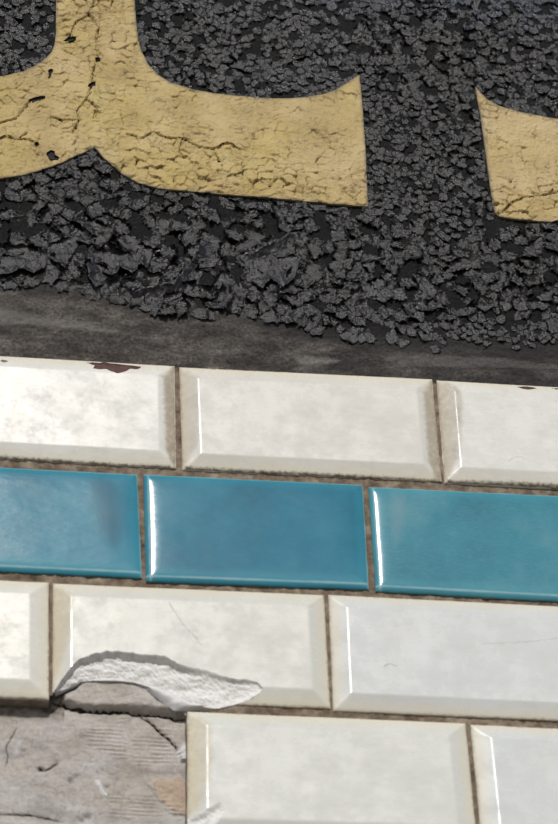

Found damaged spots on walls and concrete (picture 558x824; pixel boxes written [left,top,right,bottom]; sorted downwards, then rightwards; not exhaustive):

peeling [0,0,558,353]
peeling [89,362,141,373]
spalling [51,650,262,712]
crack [53,703,185,750]
spalling [187,800,225,824]